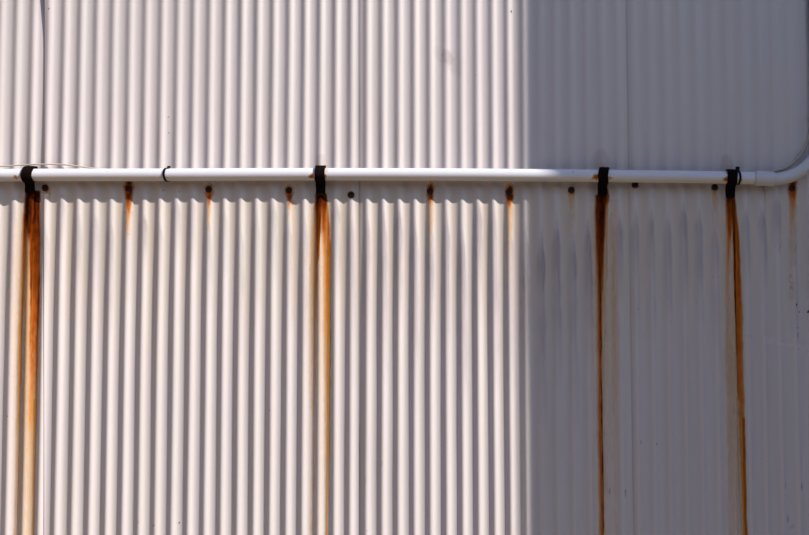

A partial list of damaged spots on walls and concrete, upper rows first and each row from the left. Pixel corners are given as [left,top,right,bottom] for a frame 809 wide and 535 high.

corrosion [16,188,50,535]
corrosion [123,181,134,229]
corrosion [311,194,331,535]
corrosion [427,183,435,225]
corrosion [595,177,615,535]
corrosion [726,198,747,535]
corrosion [788,181,797,227]